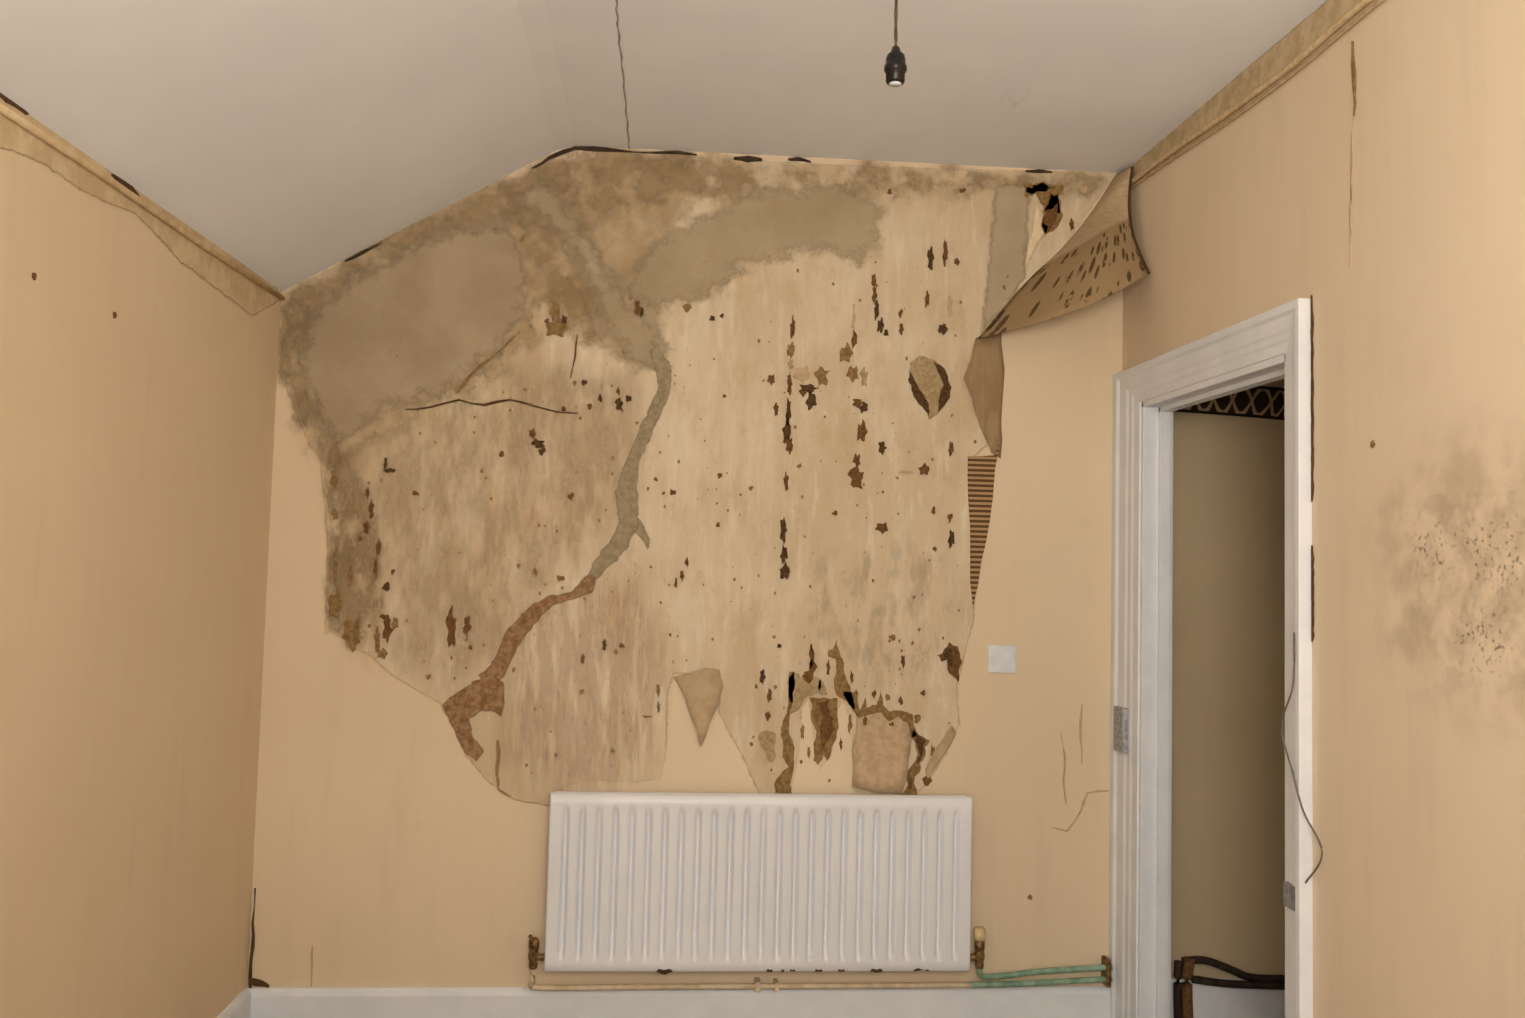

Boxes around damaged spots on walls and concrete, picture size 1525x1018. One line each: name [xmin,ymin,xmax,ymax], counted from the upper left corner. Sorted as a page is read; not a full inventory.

flaking render [0,0,1378,806]